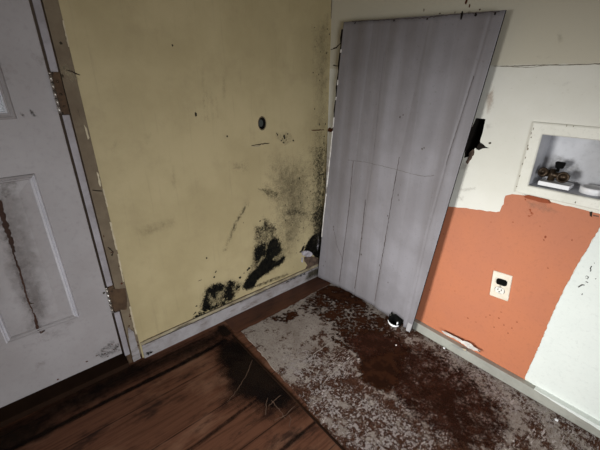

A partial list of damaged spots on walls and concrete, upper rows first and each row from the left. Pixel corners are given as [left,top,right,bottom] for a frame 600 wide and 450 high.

leakage [285,113,326,243]
spalling [464,118,491,164]
leakage [193,219,318,319]